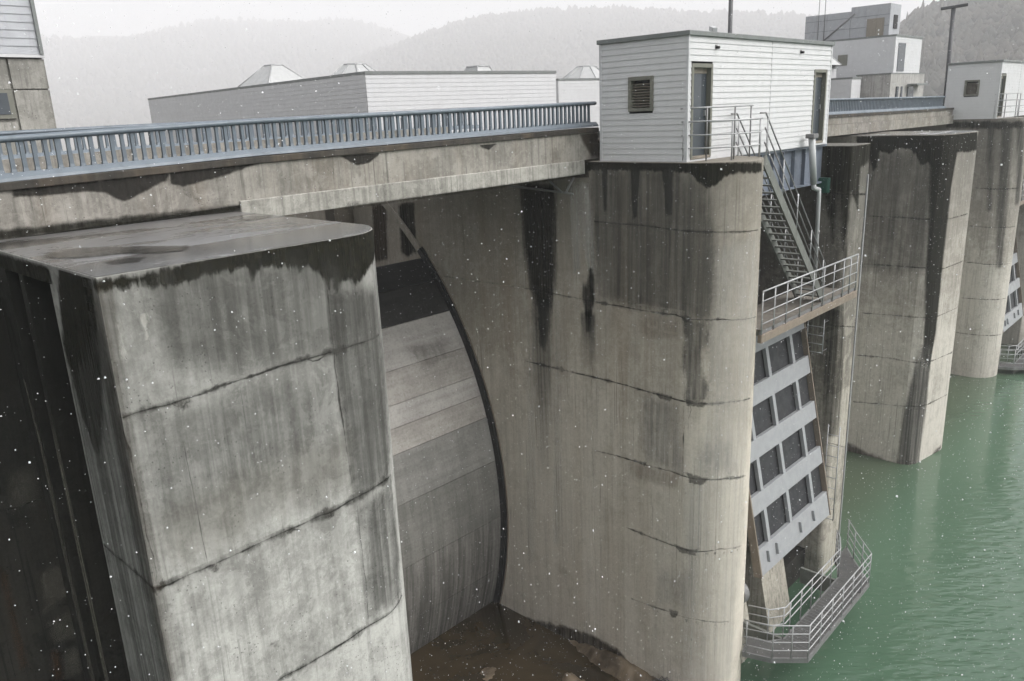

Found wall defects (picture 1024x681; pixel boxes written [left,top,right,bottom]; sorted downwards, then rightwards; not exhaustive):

water stain [989,126,1024,267]
water stain [521,183,556,392]
water stain [570,167,712,402]
water stain [897,146,957,465]
water stain [32,410,108,681]
water stain [72,341,171,681]
crack [106,547,179,593]
crack [105,342,363,462]
crack [289,477,389,531]
crack [531,362,750,443]
crack [604,452,743,484]
crack [632,529,736,555]